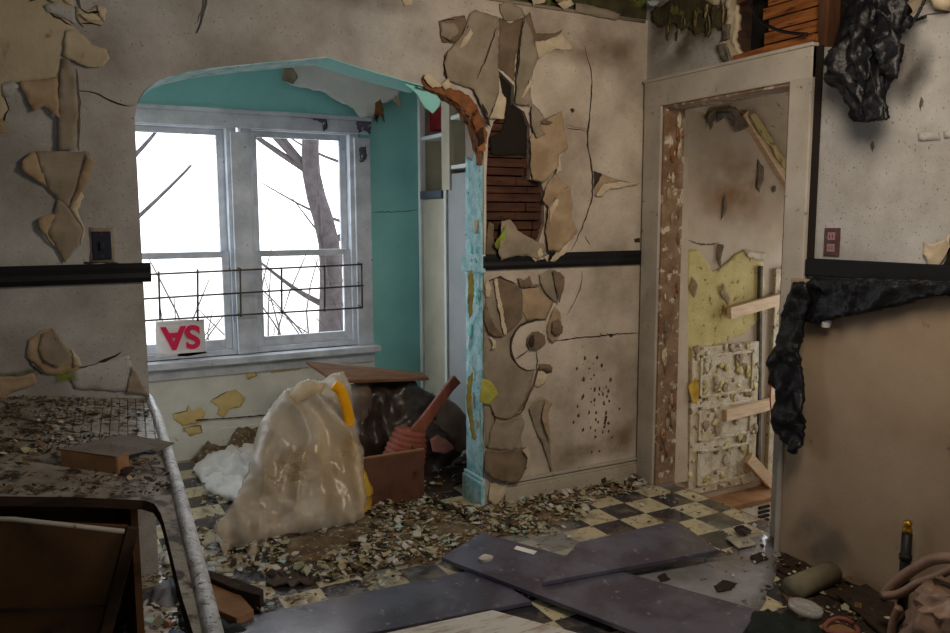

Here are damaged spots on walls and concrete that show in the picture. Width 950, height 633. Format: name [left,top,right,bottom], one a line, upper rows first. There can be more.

peeling [439,15,467,44]
peeling [532,0,621,20]
spalling [651,0,846,62]
spalling [0,0,115,263]
peeling [282,65,441,135]
spalling [465,2,541,254]
crack [566,48,594,250]
peeling [922,234,950,265]
peeling [465,270,554,478]
crack [548,333,637,343]
peeling [660,211,766,486]
peeling [173,389,244,436]